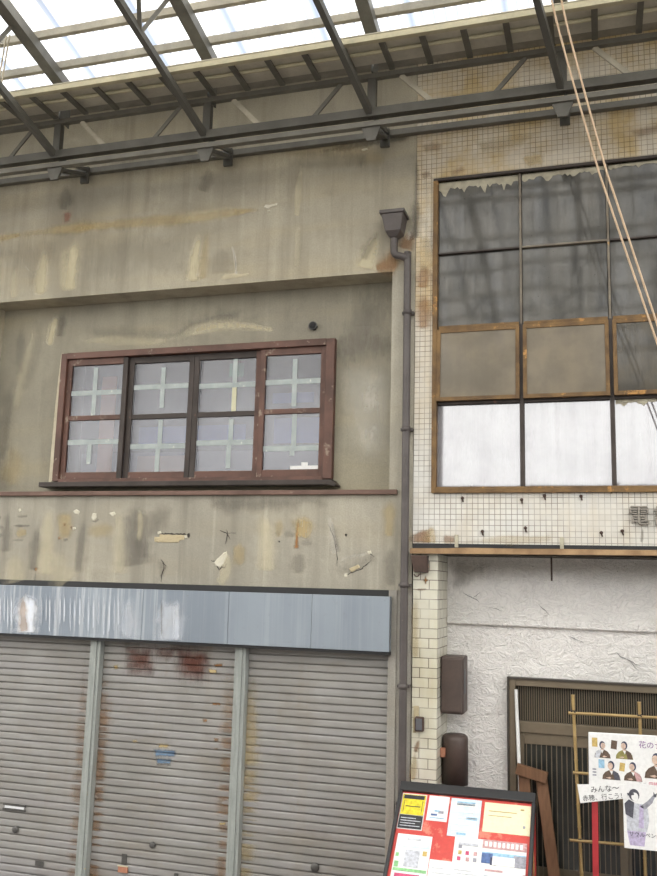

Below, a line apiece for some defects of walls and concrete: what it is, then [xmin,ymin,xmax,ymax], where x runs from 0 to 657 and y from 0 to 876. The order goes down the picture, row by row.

flaking render [211,551,227,570]
corrosion [179,651,222,678]